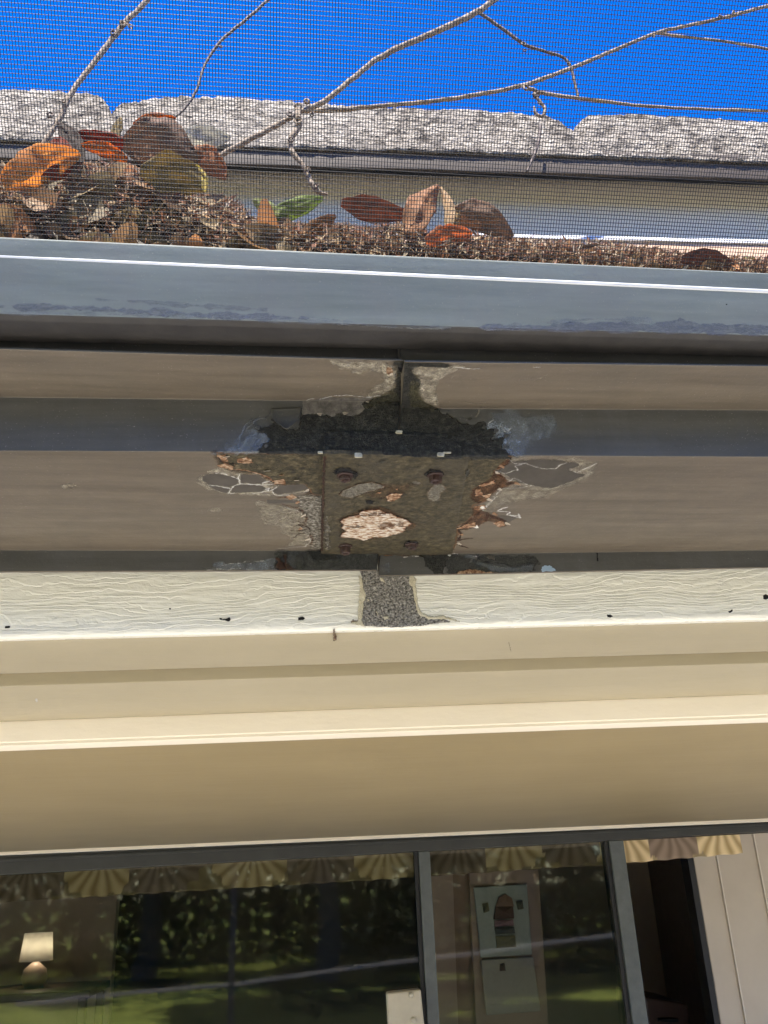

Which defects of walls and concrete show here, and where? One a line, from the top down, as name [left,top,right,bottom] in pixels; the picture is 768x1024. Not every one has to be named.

peeling [198,468,307,504]
rust [212,451,326,551]
peeling [333,468,419,547]
rust [340,482,413,540]
peeling [255,362,593,523]
rust [453,455,521,549]